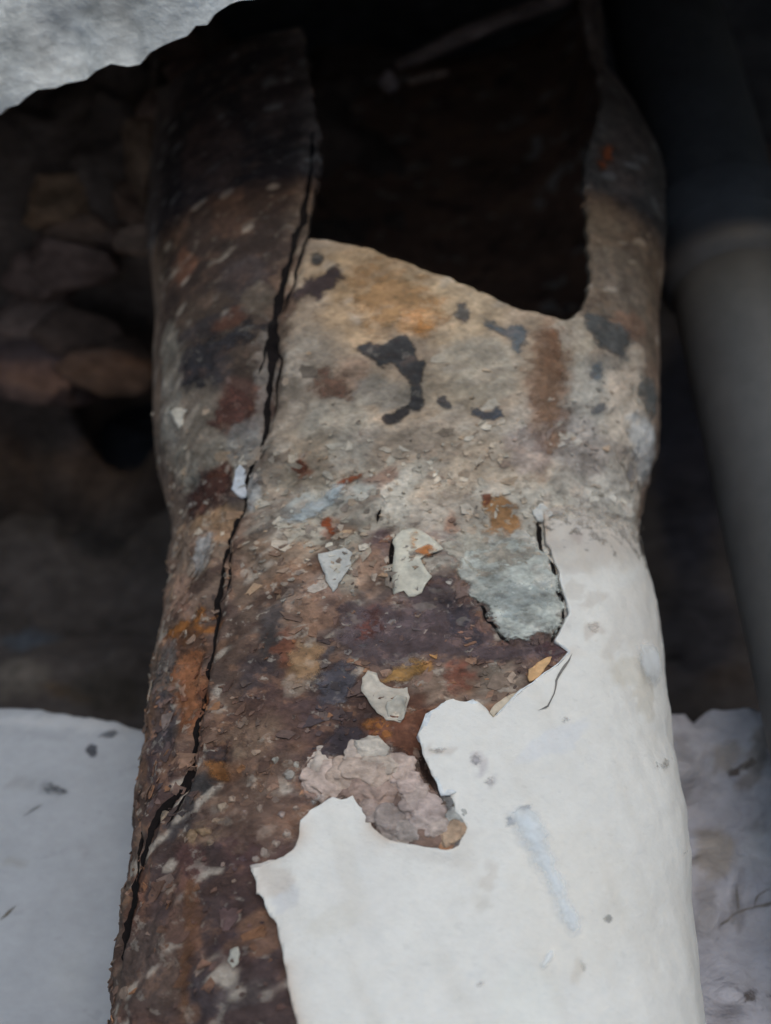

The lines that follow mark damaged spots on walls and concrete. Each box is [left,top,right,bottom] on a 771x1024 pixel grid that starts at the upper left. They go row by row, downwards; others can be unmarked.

water stain [357,335,452,424]
water stain [484,321,528,353]
water stain [583,313,634,360]
crack [121,130,318,961]
peeling [318,548,353,592]
corrosion [289,576,567,705]
peeling [392,528,570,717]
corrosion [481,494,520,537]
crack [533,507,572,710]
corrosion [319,708,428,760]
peeling [361,670,410,723]
spalling [186,735,467,880]